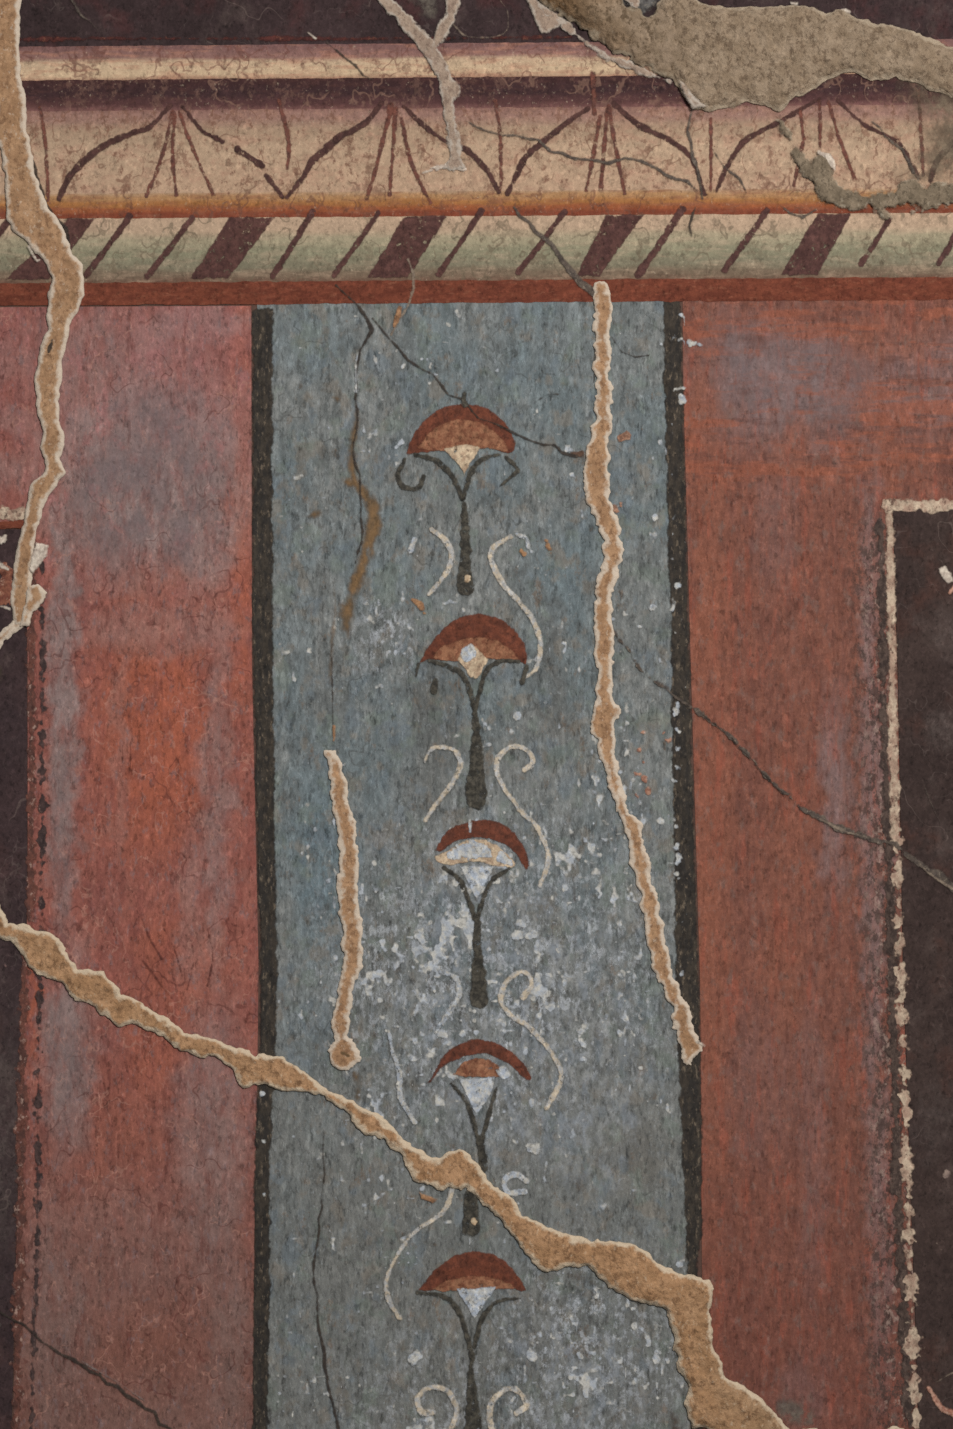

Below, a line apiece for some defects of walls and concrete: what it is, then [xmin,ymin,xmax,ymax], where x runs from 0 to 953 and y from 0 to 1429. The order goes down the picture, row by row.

crack [326,42,373,80]
crack [378,0,953,235]
crack [0,0,85,649]
crack [335,207,953,1065]
peeling [663,702,681,782]
peeling [673,825,681,876]
crack [0,659,817,1429]
crack [927,1386,953,1416]